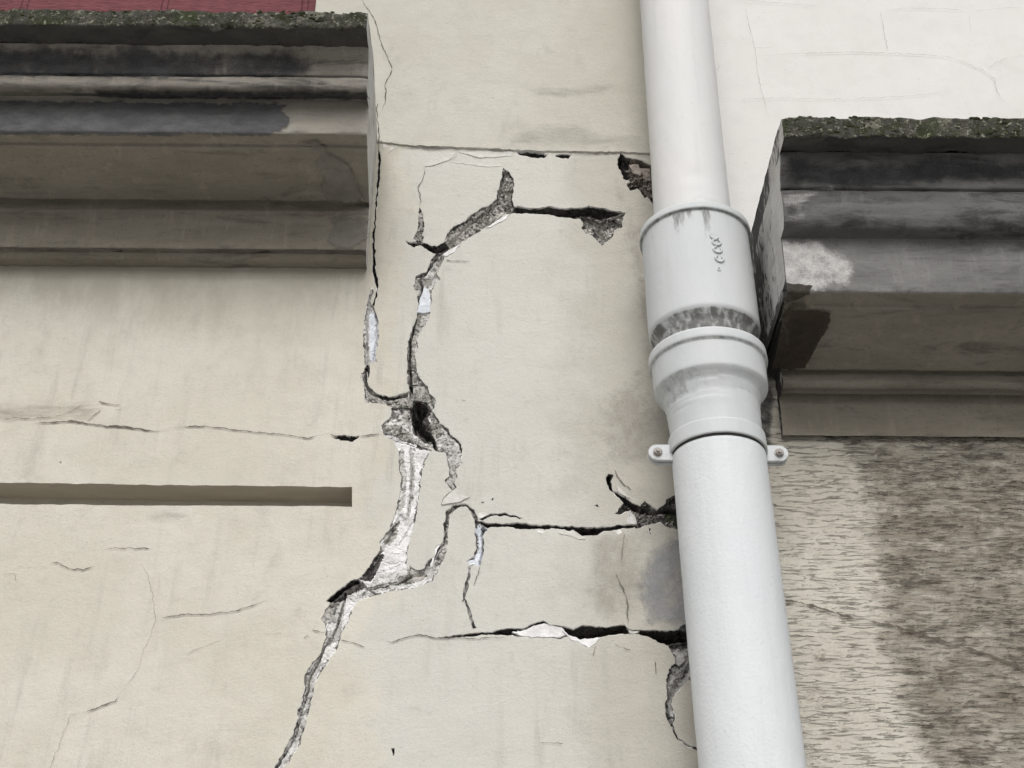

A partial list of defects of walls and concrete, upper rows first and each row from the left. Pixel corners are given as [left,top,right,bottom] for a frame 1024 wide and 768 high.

crack [45,420,152,431]
crack [185,0,687,768]
water stain [823,436,1024,768]